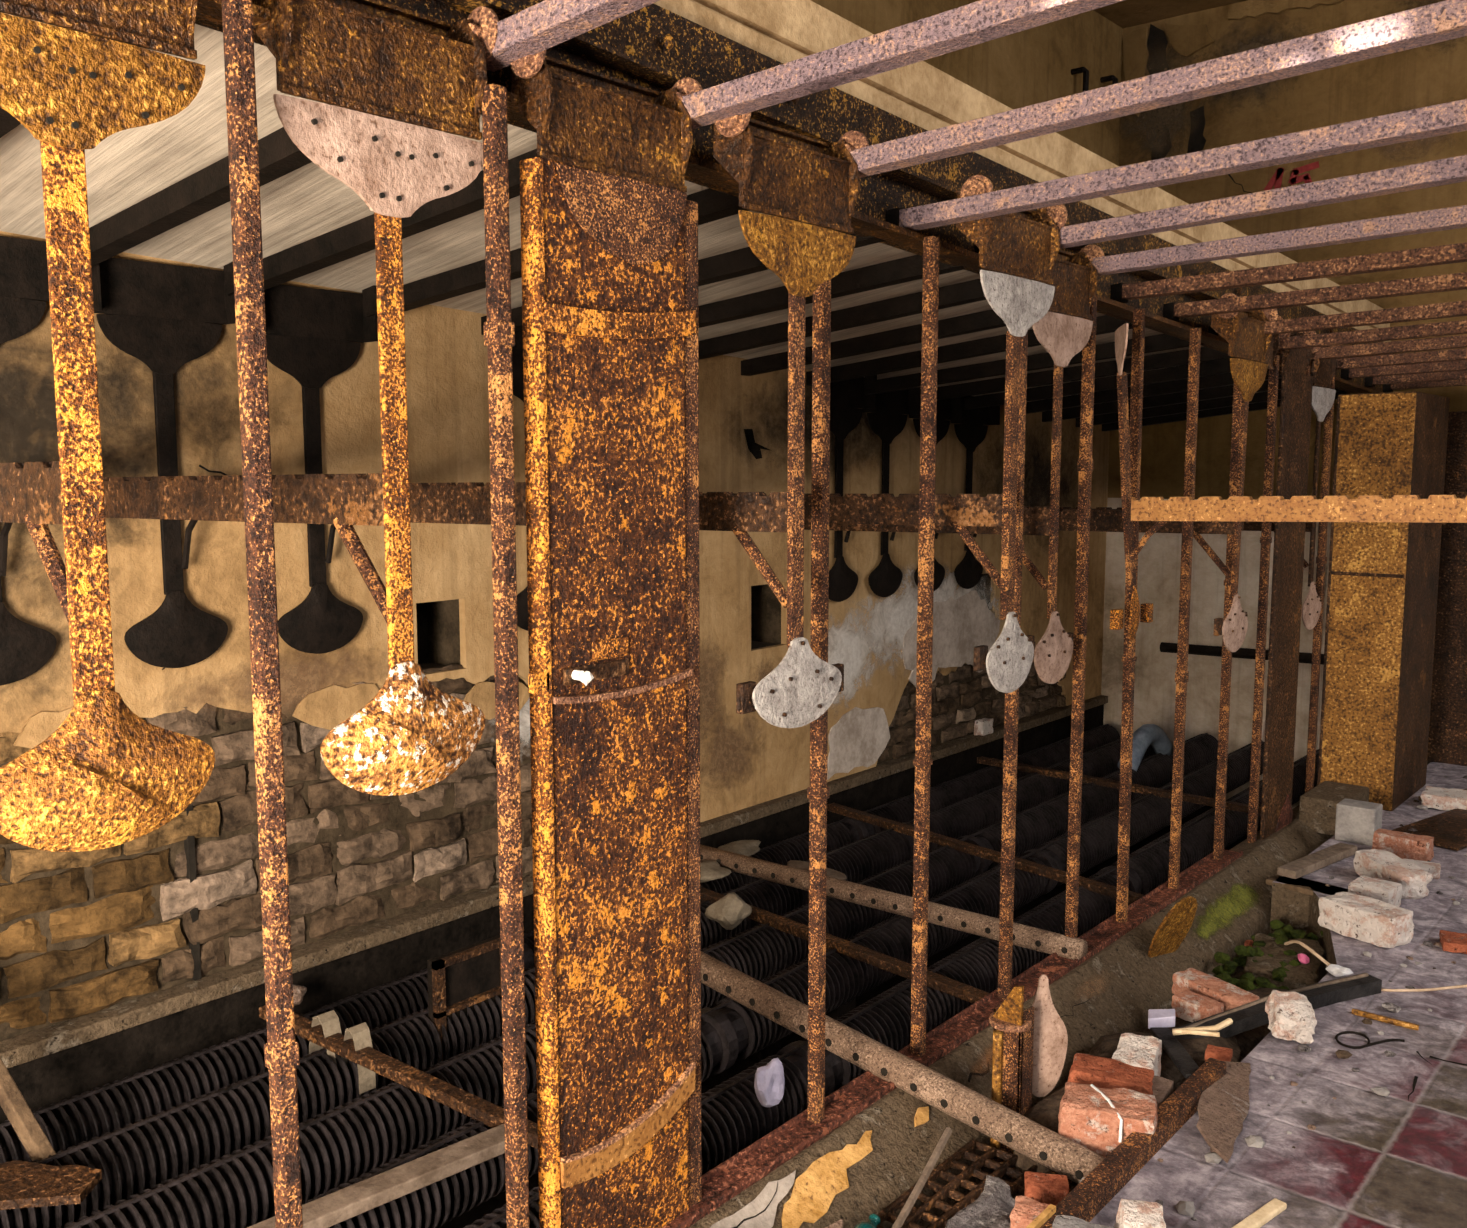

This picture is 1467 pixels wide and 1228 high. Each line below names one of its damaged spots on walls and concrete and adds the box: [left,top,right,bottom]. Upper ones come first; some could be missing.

flaking render [0,703,264,1029]
flaking render [281,664,499,948]
flaking render [519,677,533,874]
flaking render [827,590,1067,780]